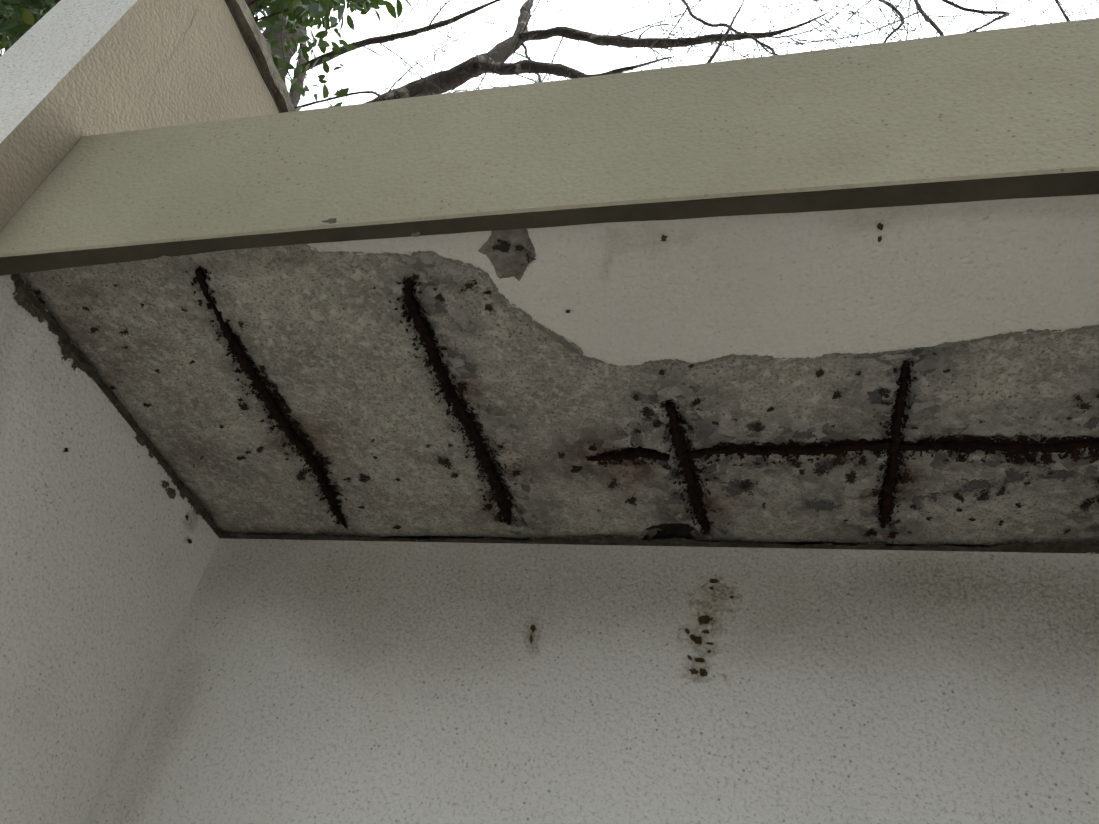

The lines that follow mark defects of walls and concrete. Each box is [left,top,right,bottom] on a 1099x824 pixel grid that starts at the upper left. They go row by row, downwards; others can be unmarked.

spalling [11,229,1099,546]
crack [17,280,1099,554]
rust [685,615,714,676]